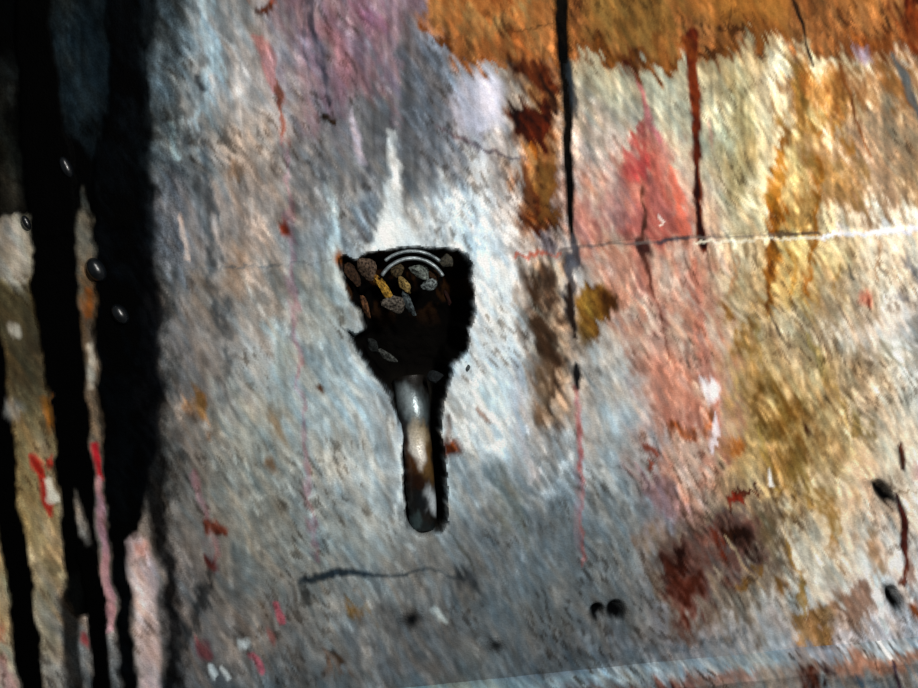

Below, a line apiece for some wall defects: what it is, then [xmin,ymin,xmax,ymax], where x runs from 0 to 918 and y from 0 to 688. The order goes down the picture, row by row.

damp [0,316,49,688]
damp [12,0,322,688]
crack [174,257,334,274]
corrosion [329,245,345,272]
damp [346,352,403,581]
corrosion [413,0,633,461]
crack [530,226,822,258]
corrosion [569,0,918,688]